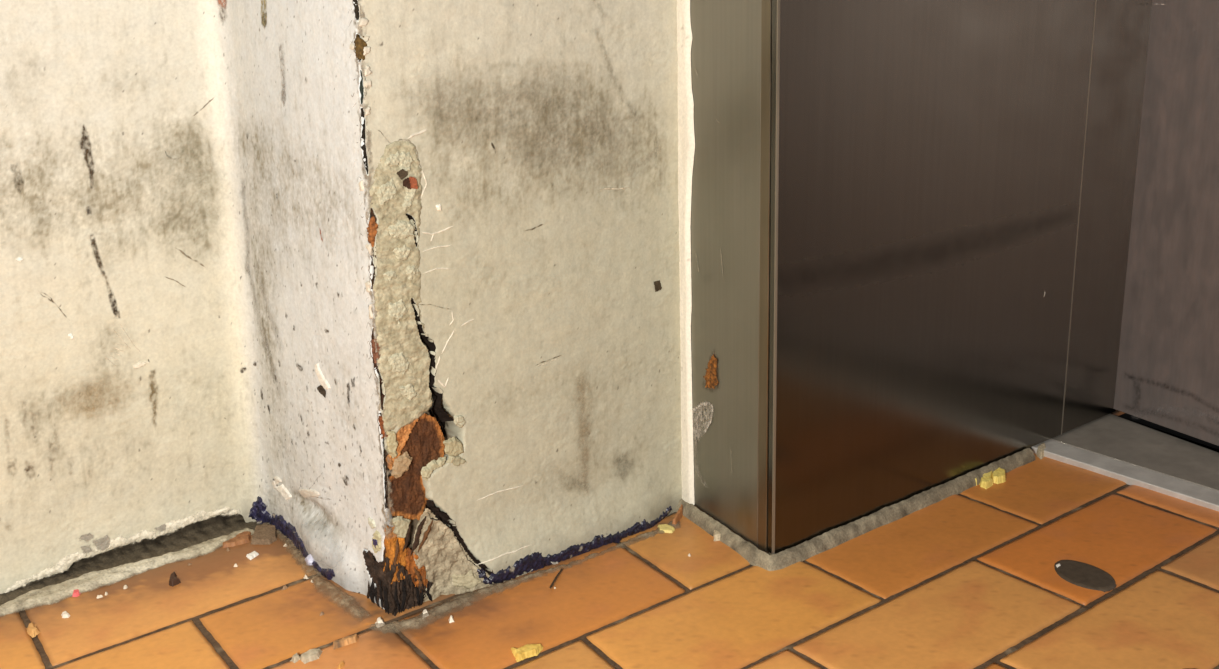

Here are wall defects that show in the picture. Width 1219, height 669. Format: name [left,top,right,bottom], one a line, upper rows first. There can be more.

crack [406,214,419,247]
spalling [296,0,529,616]
crack [411,298,454,430]
corrosion [703,354,718,389]
flaking render [0,506,262,605]
crack [425,500,493,576]